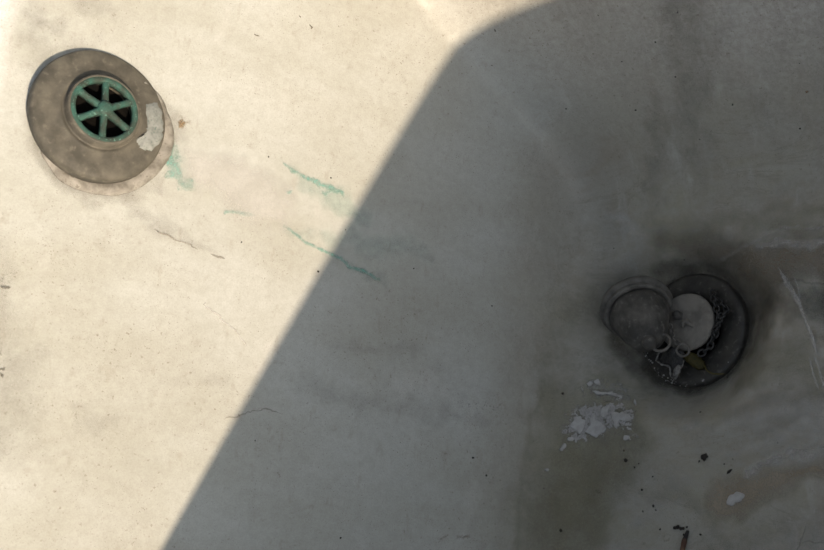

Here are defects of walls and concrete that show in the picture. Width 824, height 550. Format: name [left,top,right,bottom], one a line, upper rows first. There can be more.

peeling [559,378,637,451]
damp [709,465,824,516]